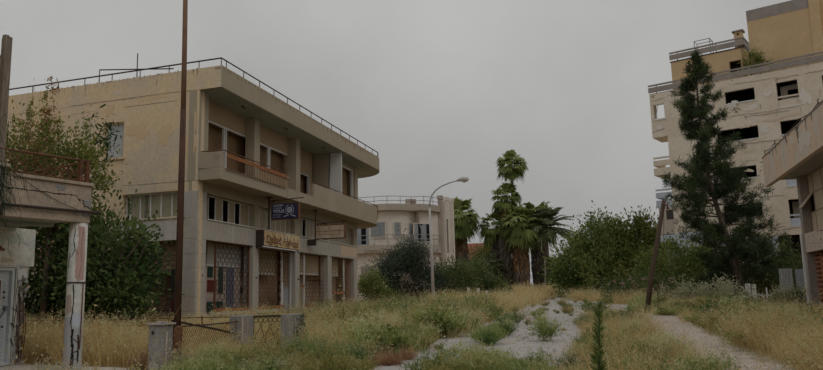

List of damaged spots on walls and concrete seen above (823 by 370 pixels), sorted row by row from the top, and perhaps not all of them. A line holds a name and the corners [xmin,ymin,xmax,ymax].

crack [7,186,90,209]
crack [68,227,84,369]